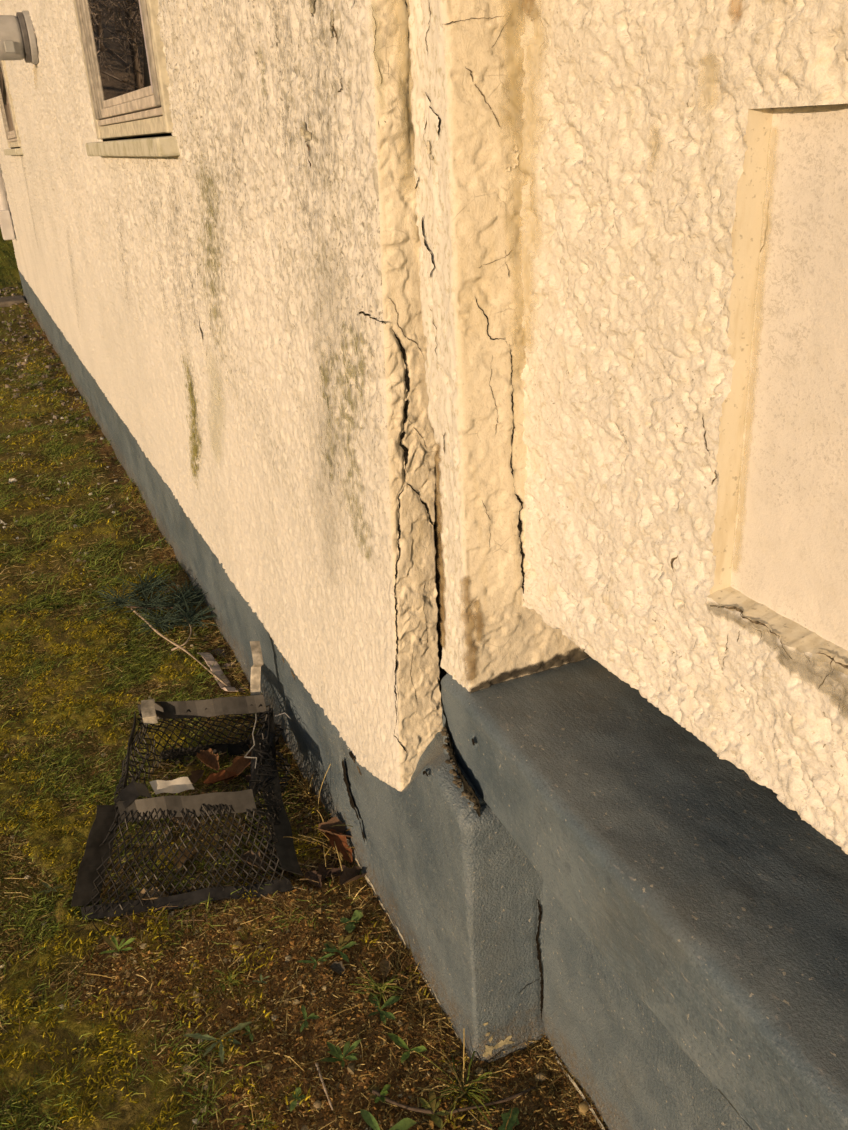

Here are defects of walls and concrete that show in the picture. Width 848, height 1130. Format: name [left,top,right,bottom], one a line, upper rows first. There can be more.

crack [372,0,517,189]
damp [196,166,224,349]
crack [422,217,435,277]
damp [181,356,202,489]
damp [319,318,372,559]
crack [475,297,525,600]
crack [357,297,481,817]
crack [710,605,848,689]
crack [342,751,365,843]
crack [519,899,544,1020]